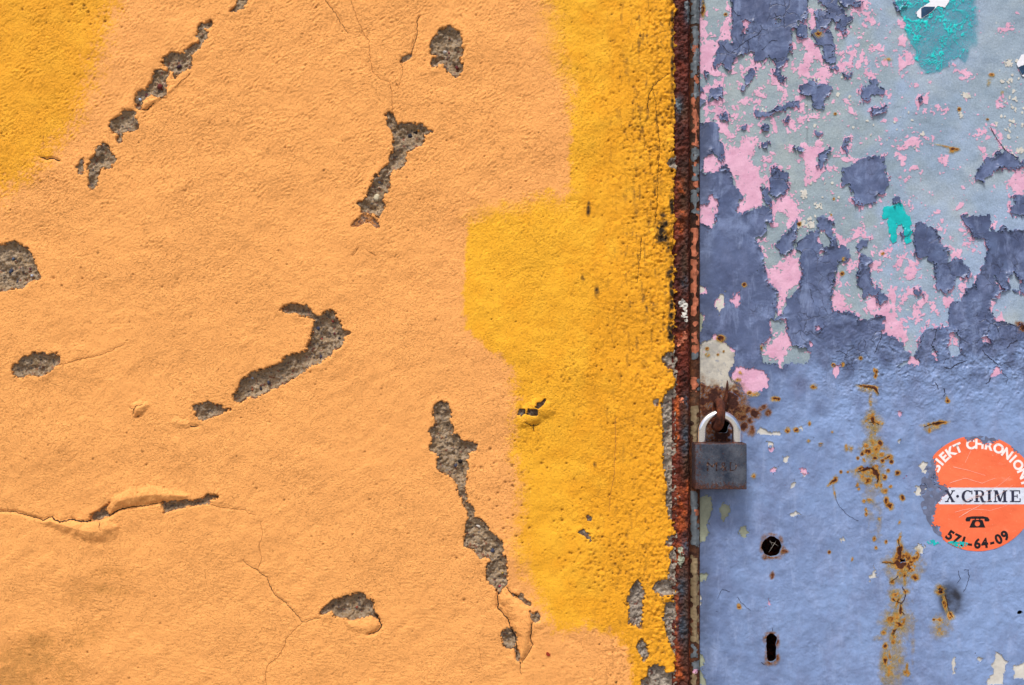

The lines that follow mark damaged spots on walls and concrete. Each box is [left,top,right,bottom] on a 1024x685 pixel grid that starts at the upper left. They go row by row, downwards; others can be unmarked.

spalling [76,20,213,190]
spalling [351,112,433,229]
spalling [0,240,41,292]
crack [0,501,163,530]
crack [210,489,319,685]
spalling [193,303,351,421]
spalling [428,401,540,623]
corrosion [700,371,781,442]
peeling [627,0,1024,685]
corrosion [827,368,905,520]
corrosion [872,521,920,677]
corrosion [932,585,954,635]